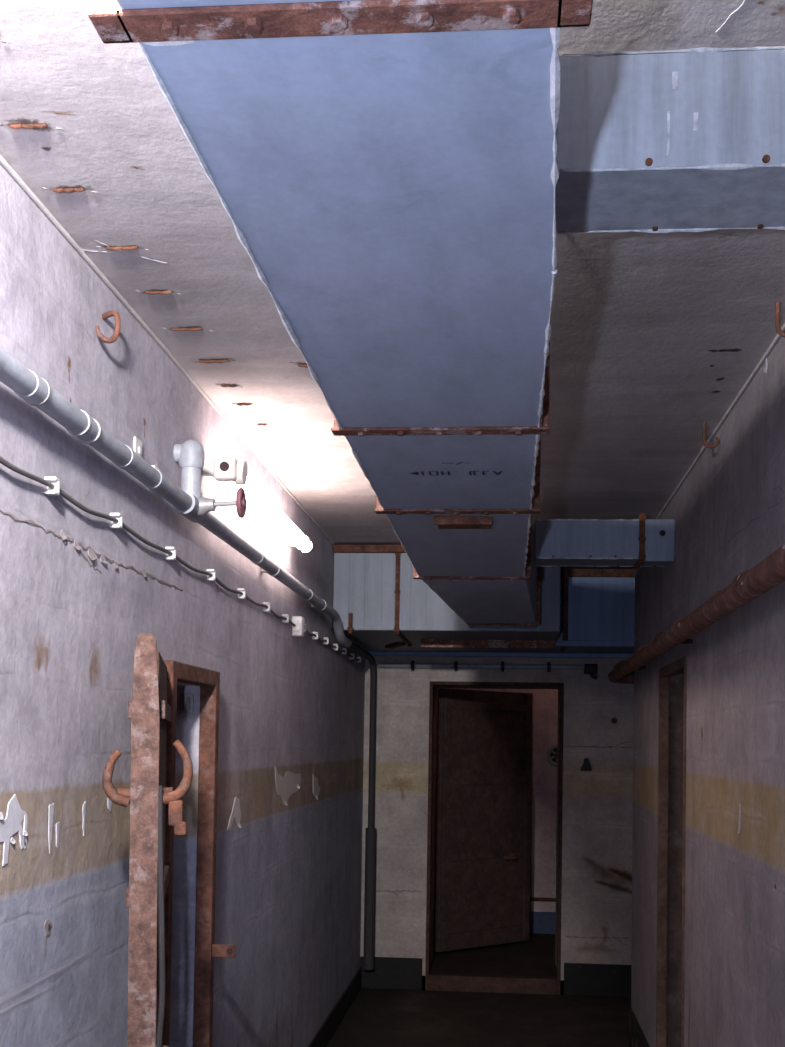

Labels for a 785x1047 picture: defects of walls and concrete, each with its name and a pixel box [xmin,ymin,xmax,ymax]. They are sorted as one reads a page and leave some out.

crack [0,510,184,591]
peeling [274,766,320,806]
peeling [0,794,28,866]